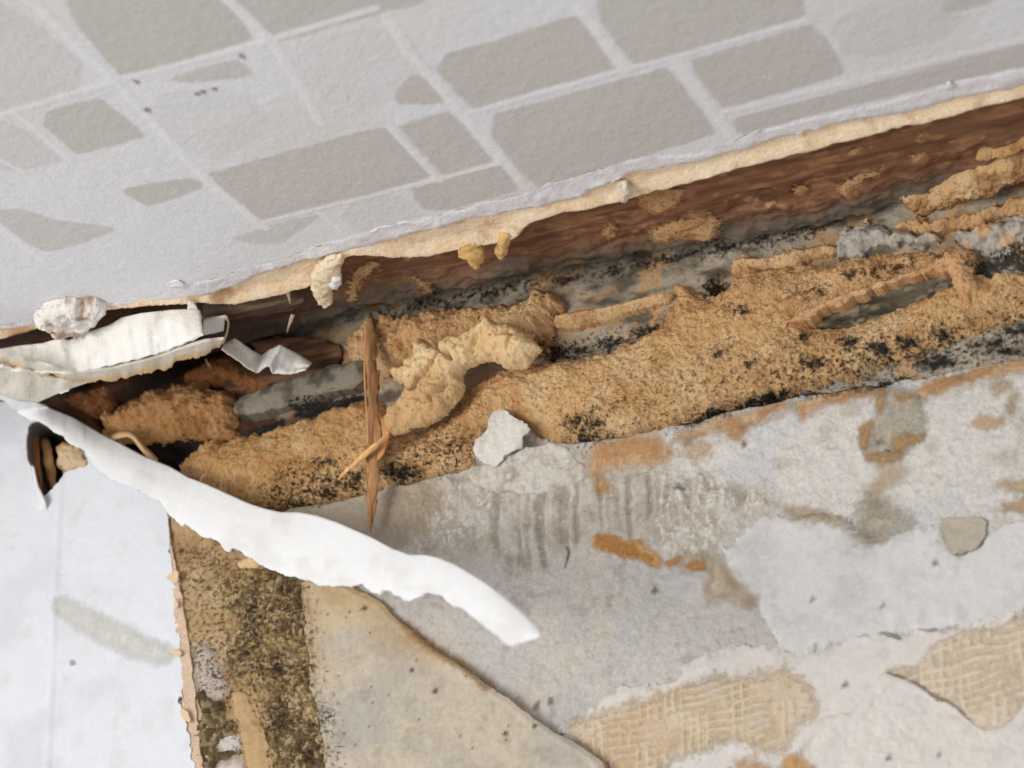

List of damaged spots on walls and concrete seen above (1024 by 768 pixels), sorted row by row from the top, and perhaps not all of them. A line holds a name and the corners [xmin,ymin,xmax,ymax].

spalling [106,81,1024,310]
leakage [956,235,1024,278]
spalling [0,325,38,339]
leakage [160,433,204,471]
leakage [235,388,368,438]
leakage [255,451,367,511]
leakage [380,424,481,489]
peeling [468,409,587,495]
leakage [549,288,1024,544]
peeling [0,394,542,768]
leakage [174,537,345,768]
peeling [556,512,1024,768]